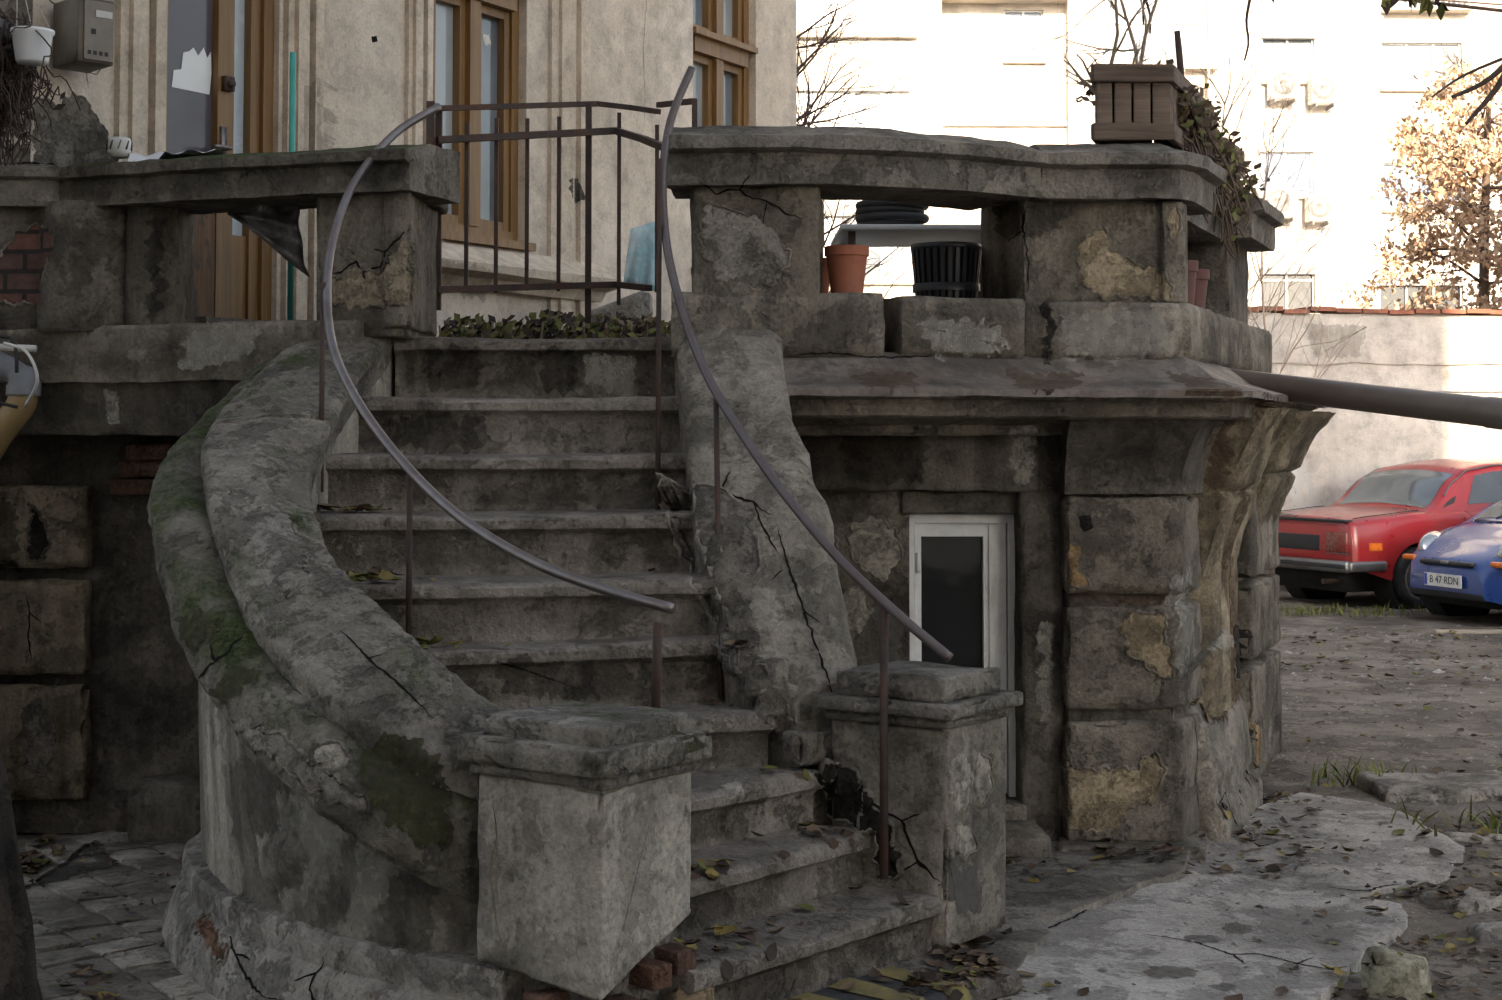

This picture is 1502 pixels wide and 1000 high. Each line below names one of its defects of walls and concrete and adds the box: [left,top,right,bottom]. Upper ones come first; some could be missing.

crack [332,230,409,279]
peeling [696,199,793,292]
spalling [1075,226,1175,303]
crack [688,472,837,694]
crack [340,631,432,717]
spalling [1119,609,1176,681]
spalling [808,759,905,883]
crack [860,799,942,883]
spalling [1058,751,1168,835]
crack [229,936,324,1000]